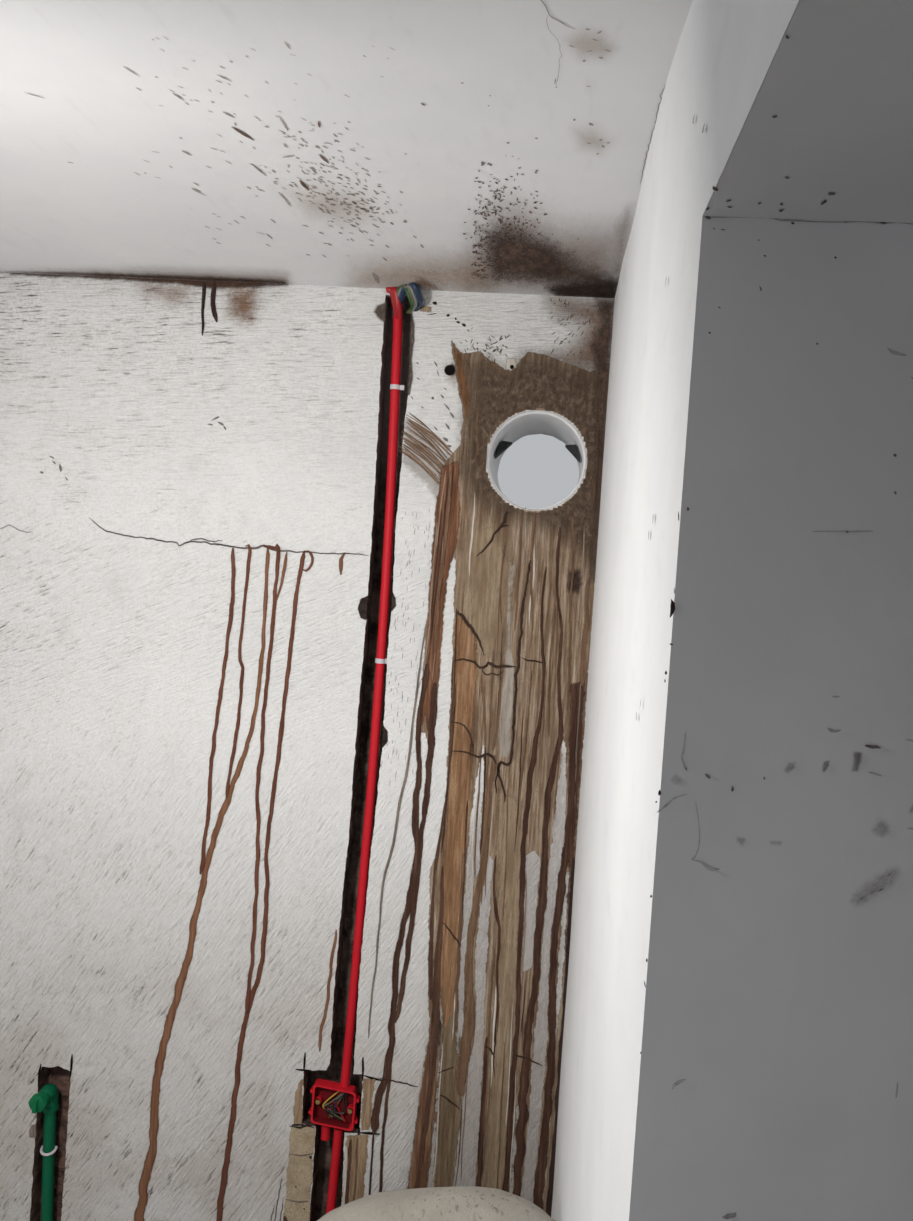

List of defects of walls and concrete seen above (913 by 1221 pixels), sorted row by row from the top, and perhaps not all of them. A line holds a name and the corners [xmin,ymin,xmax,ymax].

crack [541,0,574,83]
water stain [170,48,256,164]
water stain [248,111,407,261]
water stain [11,272,287,336]
crack [89,517,368,556]
crack [476,511,509,557]
water stain [368,142,618,1217]
crack [451,560,546,802]
corrosion [134,544,314,1221]